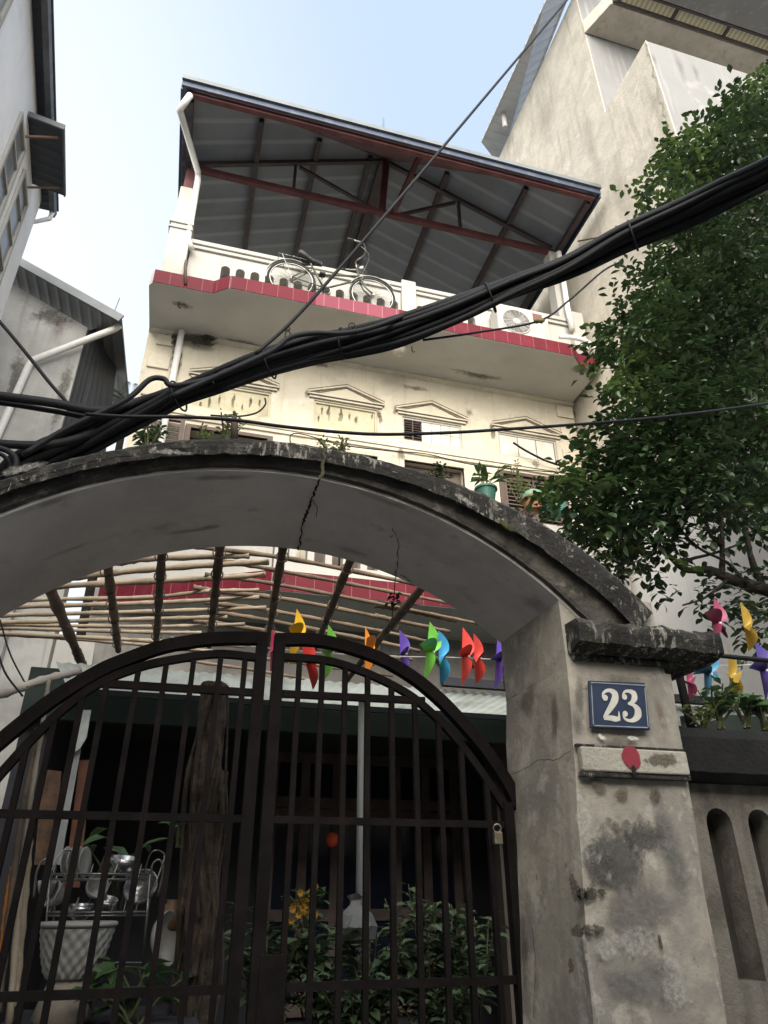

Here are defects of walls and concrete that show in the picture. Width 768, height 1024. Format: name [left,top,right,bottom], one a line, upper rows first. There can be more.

damp [166,332,218,367]
crack [297,448,326,550]
crack [511,750,681,779]
damp [644,753,676,767]